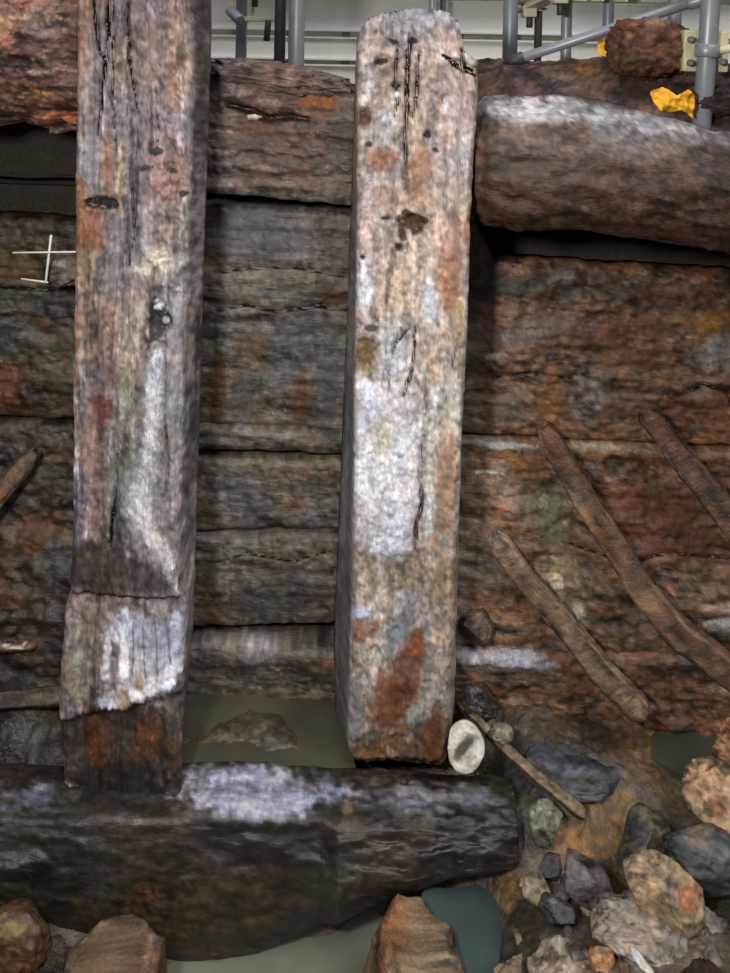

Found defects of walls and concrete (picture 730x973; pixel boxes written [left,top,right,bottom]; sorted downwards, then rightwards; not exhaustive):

crack [93,0,160,265]
crack [394,34,419,175]
crack [442,54,477,78]
crack [388,326,416,397]